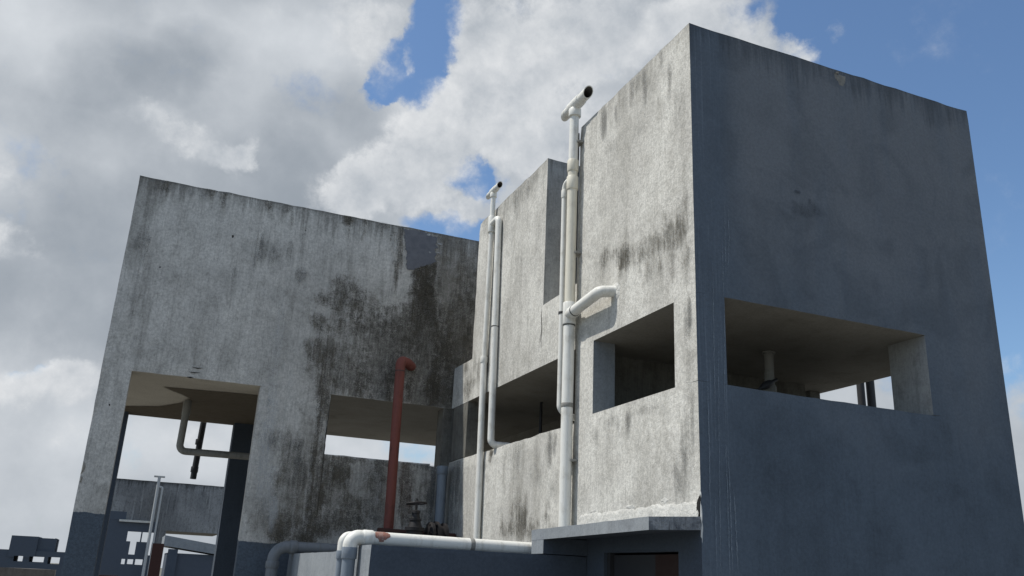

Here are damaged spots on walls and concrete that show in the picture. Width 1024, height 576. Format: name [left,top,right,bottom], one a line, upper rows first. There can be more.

damp [602,220,686,276]
damp [313,264,490,408]
damp [268,404,367,544]